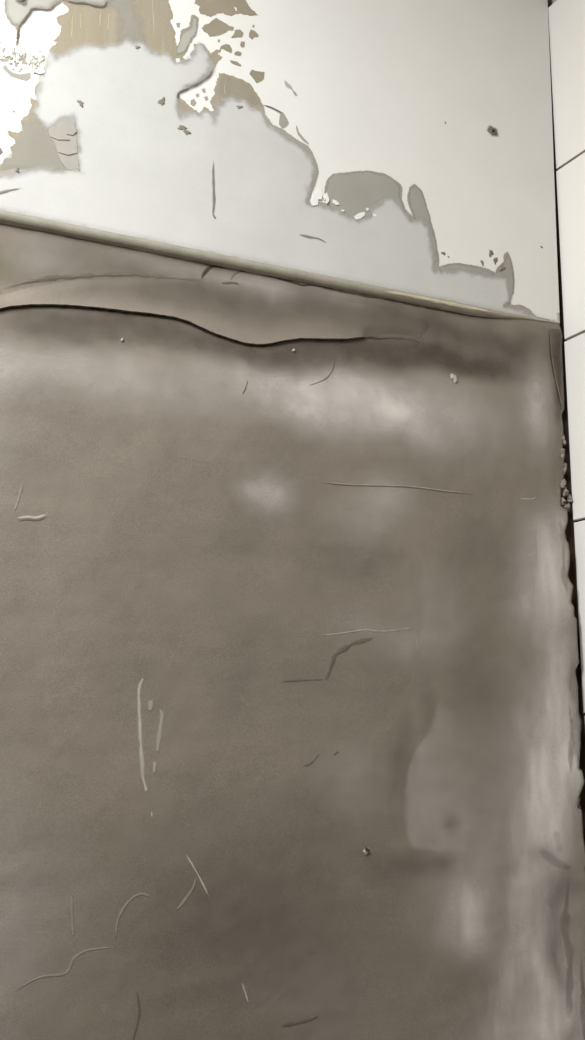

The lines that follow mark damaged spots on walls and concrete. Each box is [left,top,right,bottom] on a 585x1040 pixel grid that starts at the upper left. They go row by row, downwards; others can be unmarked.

peeling [0,0,553,322]
crack [10,265,402,385]
leakage [33,313,504,376]
crack [261,274,487,318]
leakage [138,679,164,791]